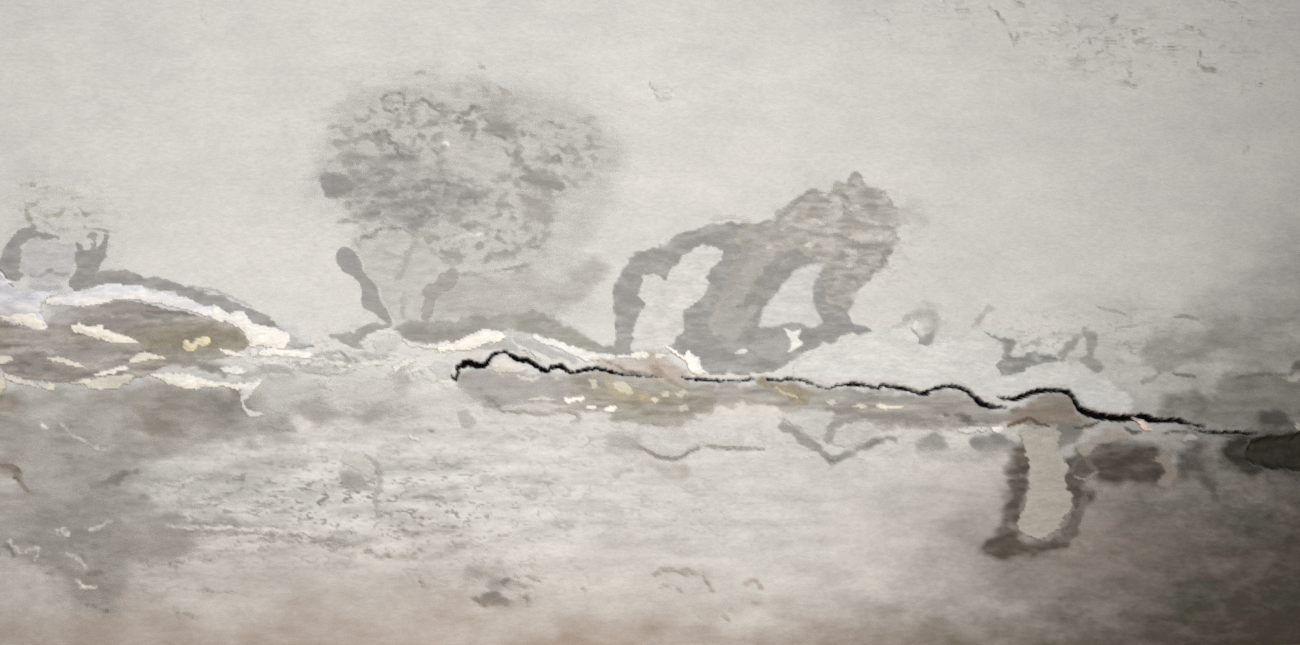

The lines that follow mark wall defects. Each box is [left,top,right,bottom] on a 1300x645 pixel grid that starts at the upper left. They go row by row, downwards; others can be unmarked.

leakage [0,203,314,349]
leakage [320,66,927,375]
spalling [0,269,1152,447]
crack [451,350,1258,499]
leakage [917,432,948,449]
leakage [970,315,1233,561]
spalling [1208,372,1300,483]